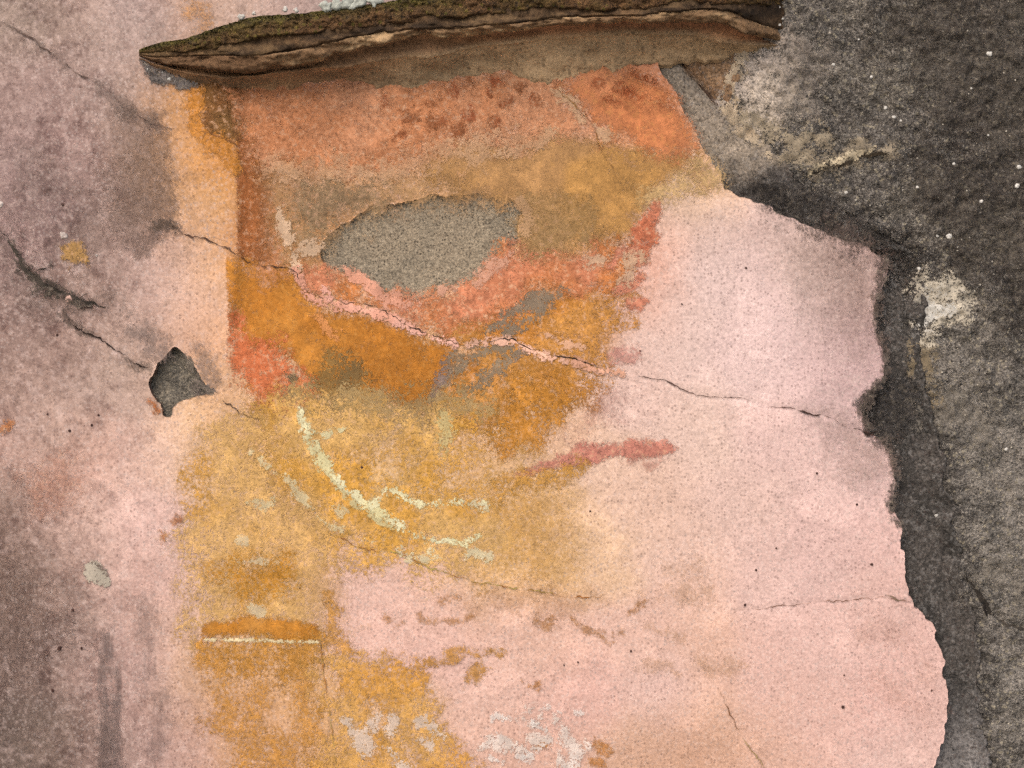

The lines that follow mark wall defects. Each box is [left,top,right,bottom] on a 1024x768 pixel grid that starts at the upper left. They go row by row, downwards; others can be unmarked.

rust [184,86,242,175]
spalling [715,28,904,191]
crack [1,233,148,371]
spalling [151,347,216,417]
spalling [275,193,662,339]
crack [166,226,879,438]
spalling [902,265,980,408]
crack [745,595,913,610]
rust [588,740,614,768]